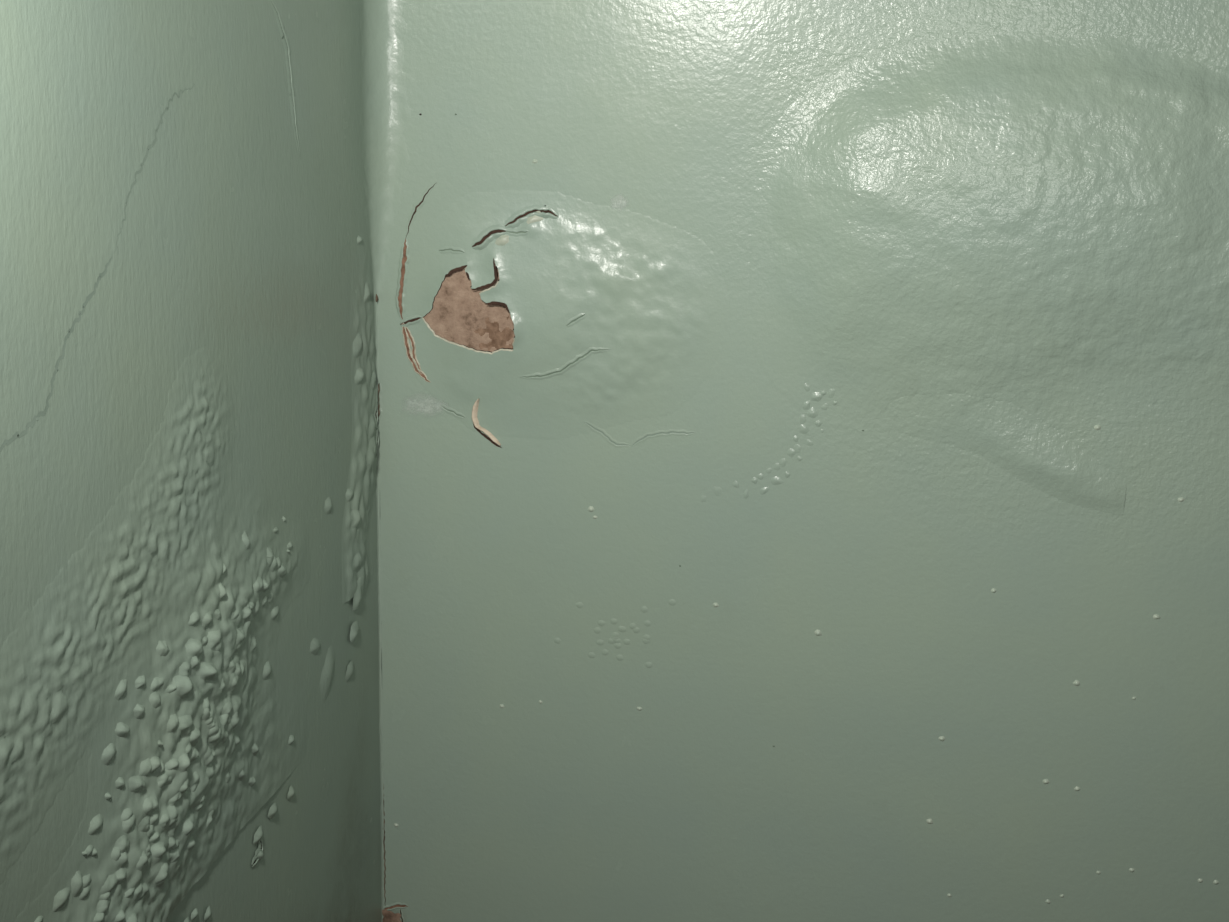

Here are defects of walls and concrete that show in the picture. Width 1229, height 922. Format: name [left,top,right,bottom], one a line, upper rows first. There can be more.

crack [0,85,194,452]
peeling [422,258,515,354]
peeling [472,398,502,448]